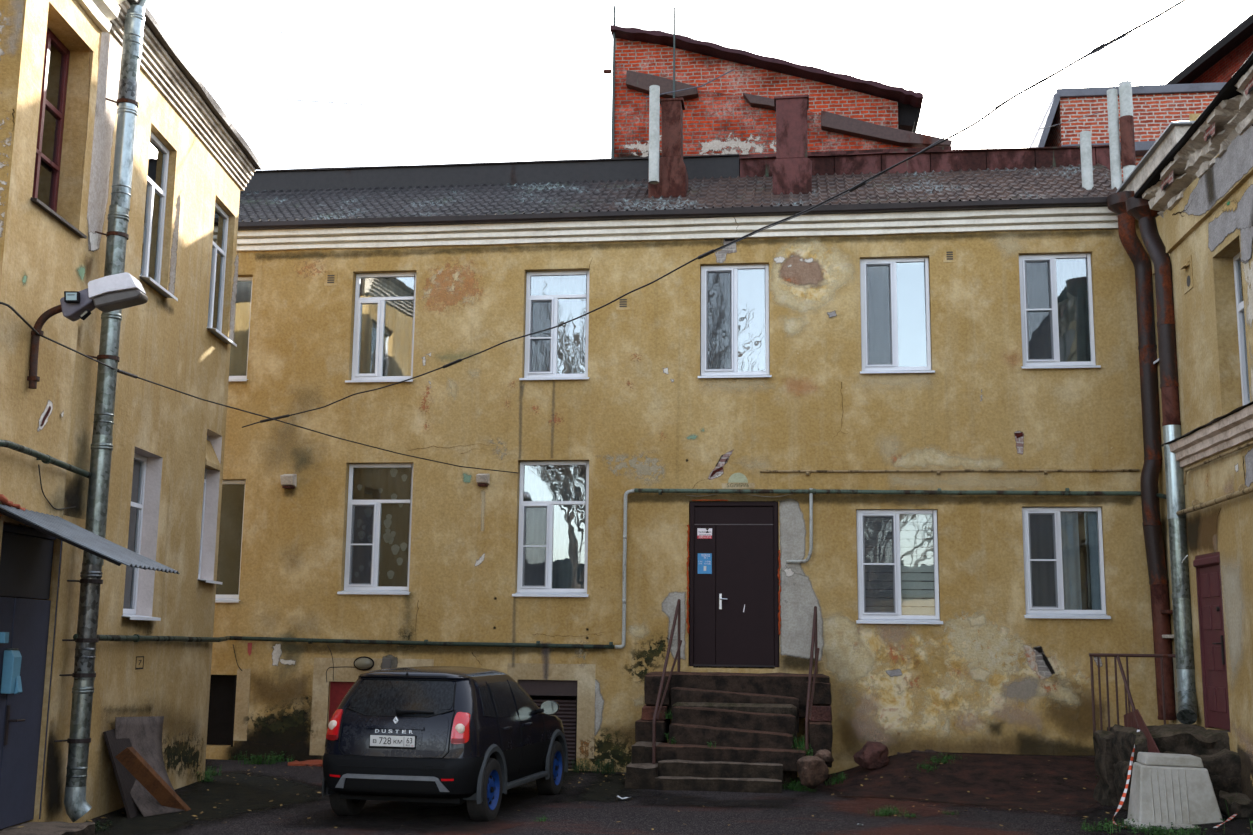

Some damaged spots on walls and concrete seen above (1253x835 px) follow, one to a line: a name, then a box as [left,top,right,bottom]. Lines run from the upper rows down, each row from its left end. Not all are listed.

peeling [0,118,11,237]
peeling [1183,122,1253,328]
peeling [771,237,853,335]
peeling [1235,448,1253,487]
peeling [662,592,686,659]
peeling [779,501,1088,739]